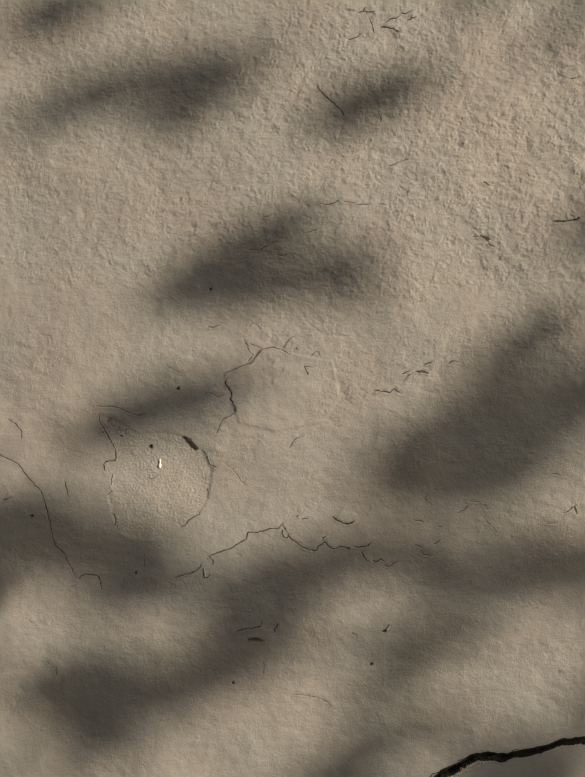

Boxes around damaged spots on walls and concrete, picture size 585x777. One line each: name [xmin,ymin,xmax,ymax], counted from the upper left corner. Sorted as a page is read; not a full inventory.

crack [203,337,321,434]
crack [98,405,146,494]
crack [0,454,102,588]
crack [175,515,398,578]
crack [430,736,585,777]